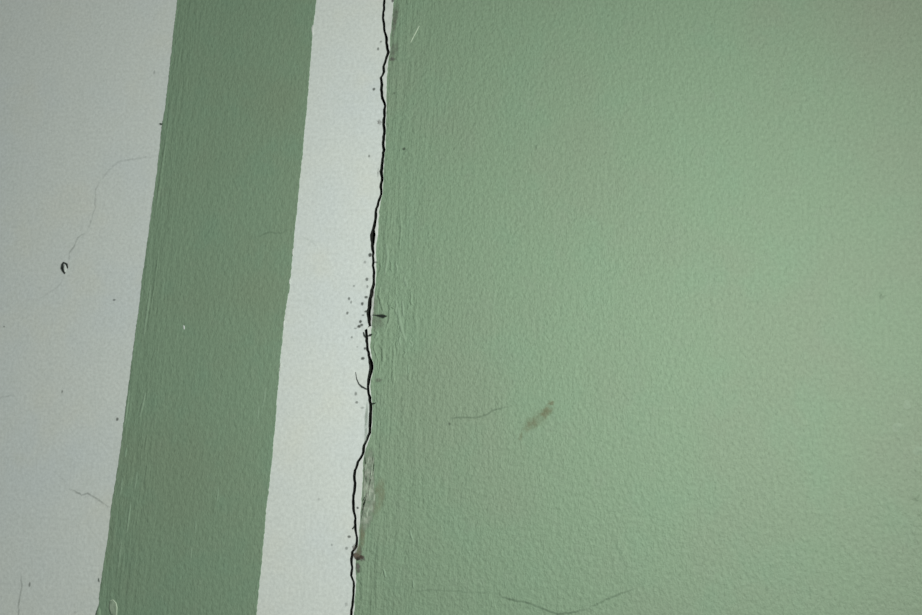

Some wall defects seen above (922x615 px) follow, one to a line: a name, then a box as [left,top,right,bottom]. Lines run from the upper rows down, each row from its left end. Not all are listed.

crack [350,0,390,615]